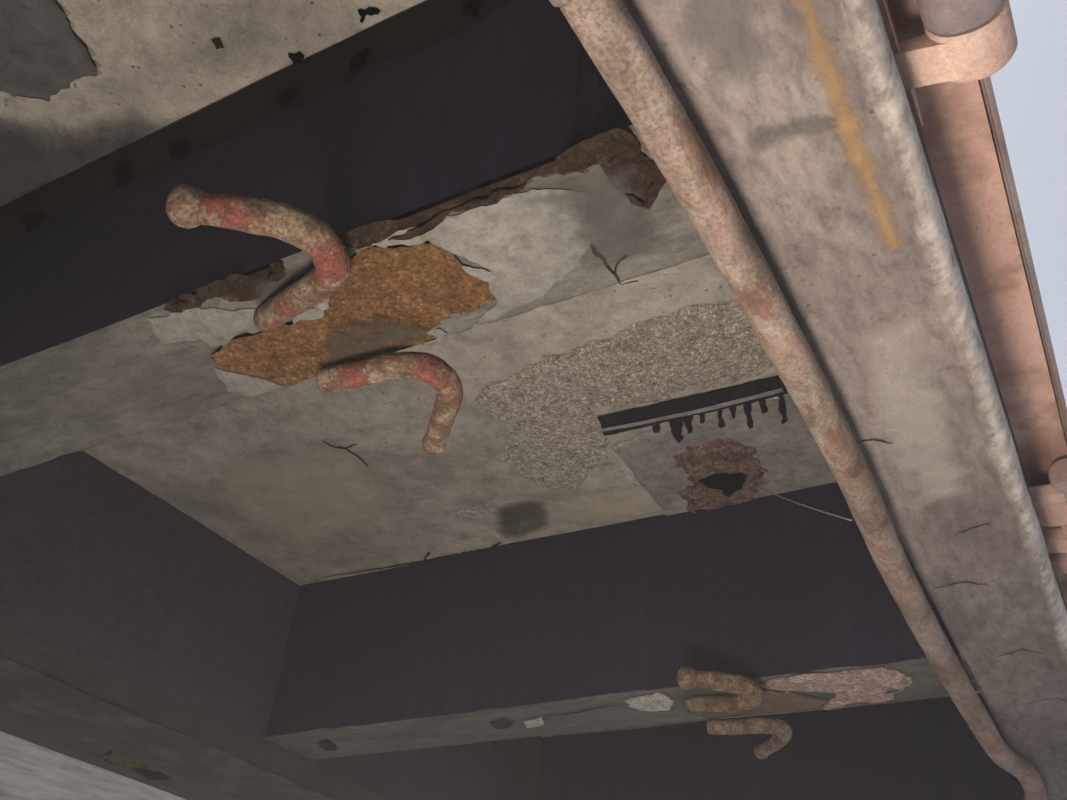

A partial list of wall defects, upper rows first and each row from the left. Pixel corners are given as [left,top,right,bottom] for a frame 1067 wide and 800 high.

peeling [338,128,667,328]
peeling [147,261,286,348]
corrosion [210,244,502,385]
peeling [214,368,285,397]
peeling [475,300,774,492]
crack [323,441,368,467]
spalling [672,438,768,513]
leakage [500,503,544,536]
peeling [760,667,913,710]